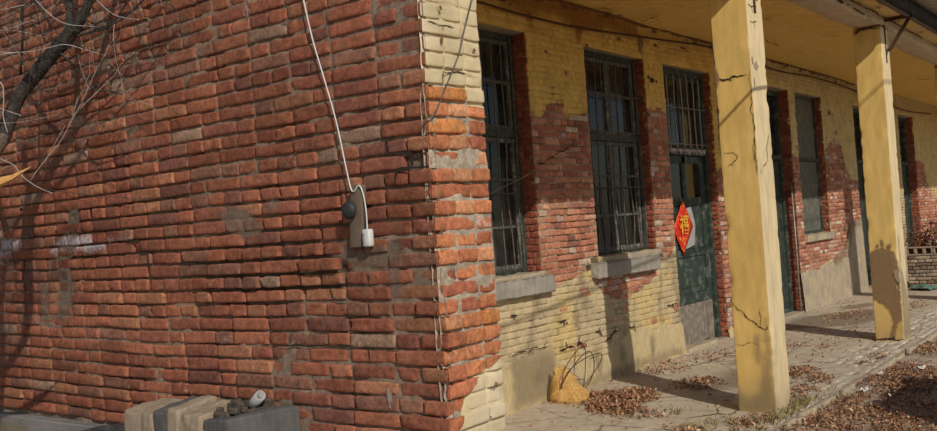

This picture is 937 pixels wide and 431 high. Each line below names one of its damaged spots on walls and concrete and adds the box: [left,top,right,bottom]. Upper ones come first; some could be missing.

crack [711,32,769,175]
peeling [530,86,598,286]
peeling [644,108,676,260]
peeling [791,131,861,272]
peeling [580,270,658,311]
crack [678,301,769,369]